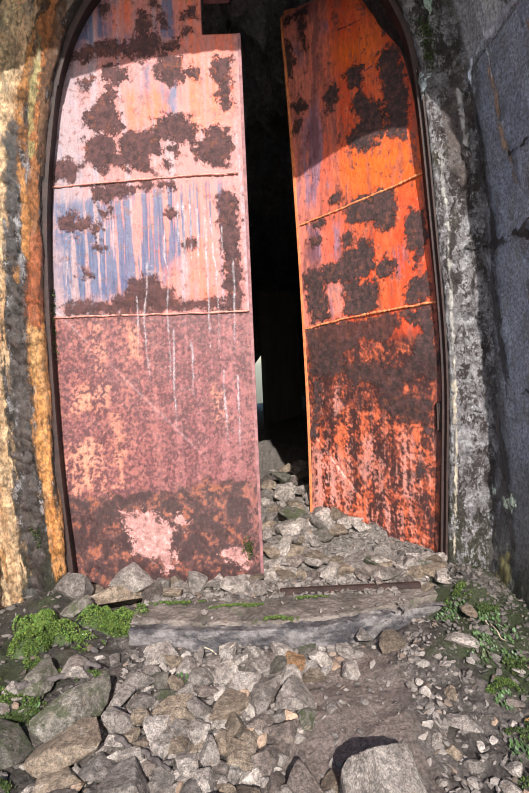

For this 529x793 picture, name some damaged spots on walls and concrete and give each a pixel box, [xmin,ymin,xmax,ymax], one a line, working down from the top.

corrosion [0,0,74,610]